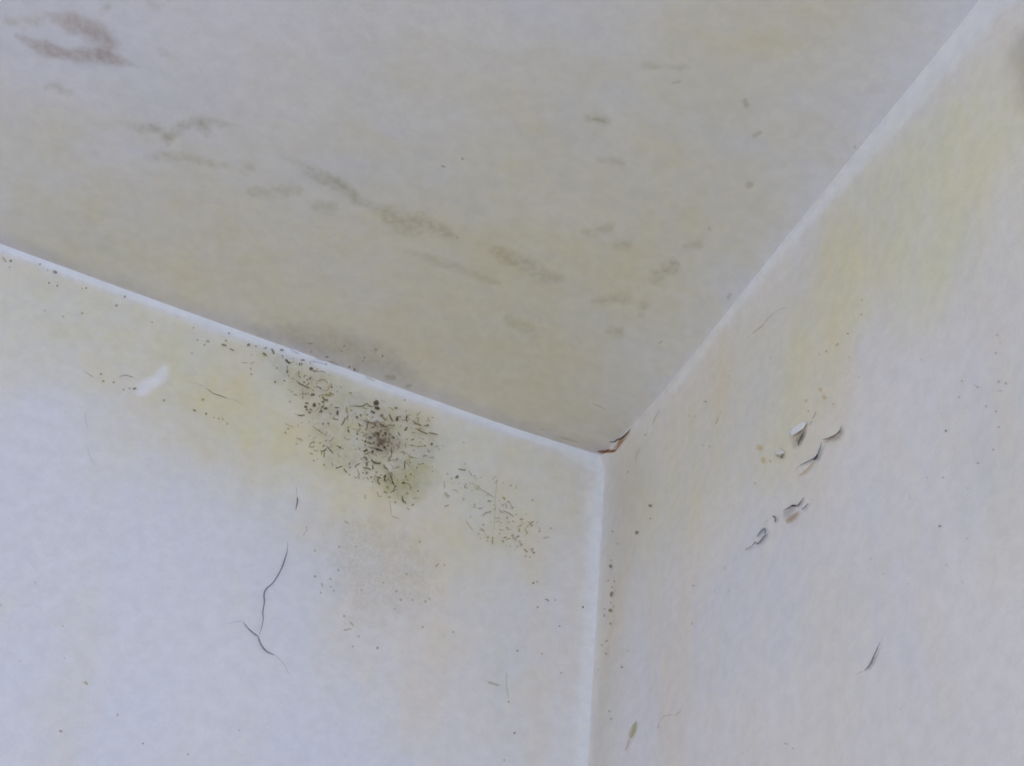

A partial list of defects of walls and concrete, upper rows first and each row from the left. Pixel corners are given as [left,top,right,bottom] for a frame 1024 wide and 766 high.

damp [263,349,437,503]
peeling [790,421,806,444]